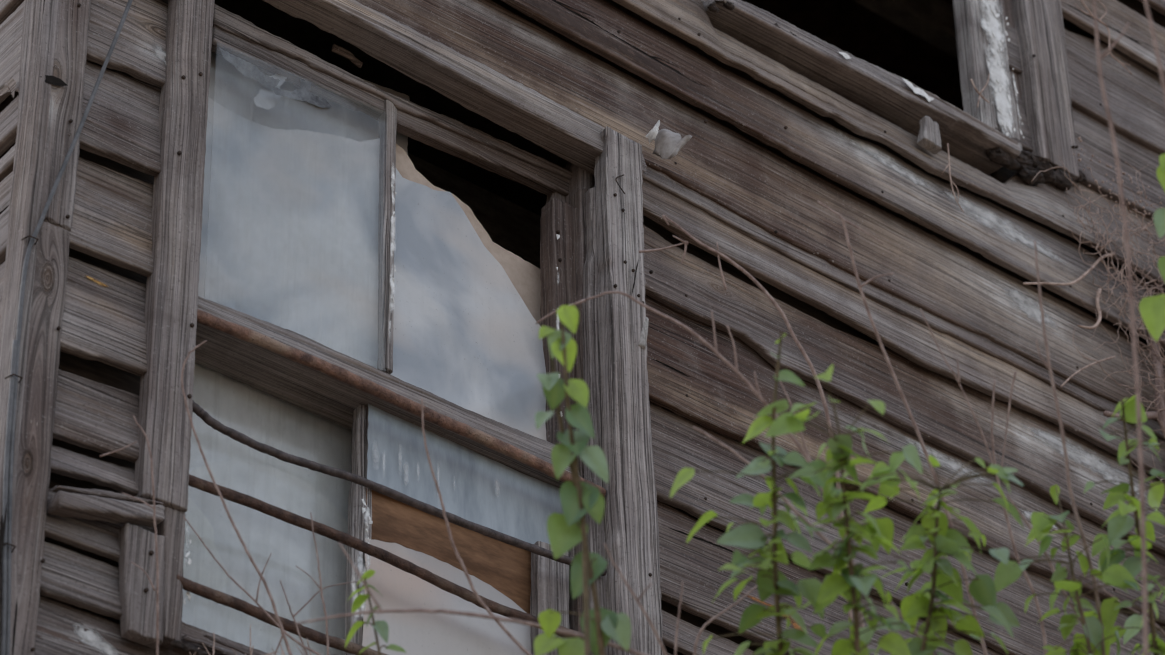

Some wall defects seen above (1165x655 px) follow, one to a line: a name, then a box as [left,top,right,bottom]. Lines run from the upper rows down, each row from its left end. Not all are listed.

peeling [981,0,1087,192]